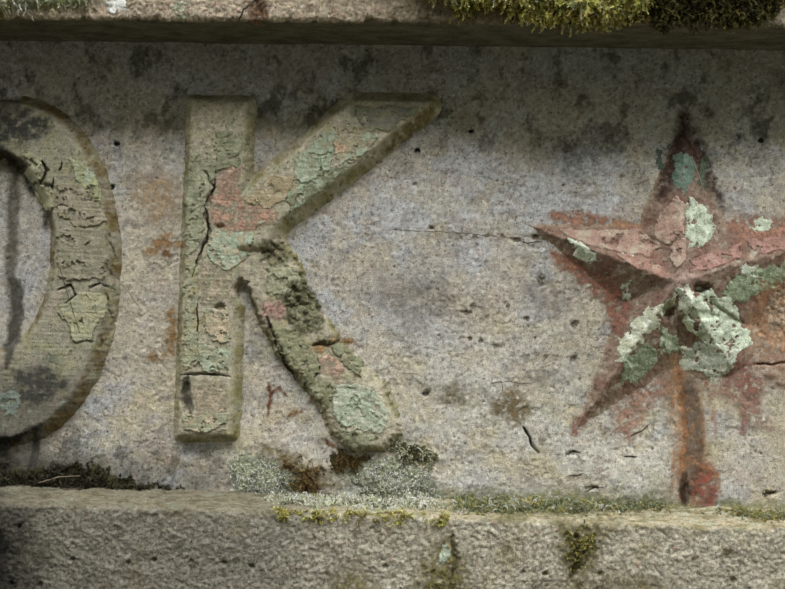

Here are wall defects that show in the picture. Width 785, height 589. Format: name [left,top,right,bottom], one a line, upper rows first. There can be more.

crack [39,160,63,207]
damp [0,108,66,404]
crack [57,282,109,303]
peeling [180,104,420,449]
peeling [559,196,785,279]
spalling [763,283,785,328]
corrosion [669,359,720,506]